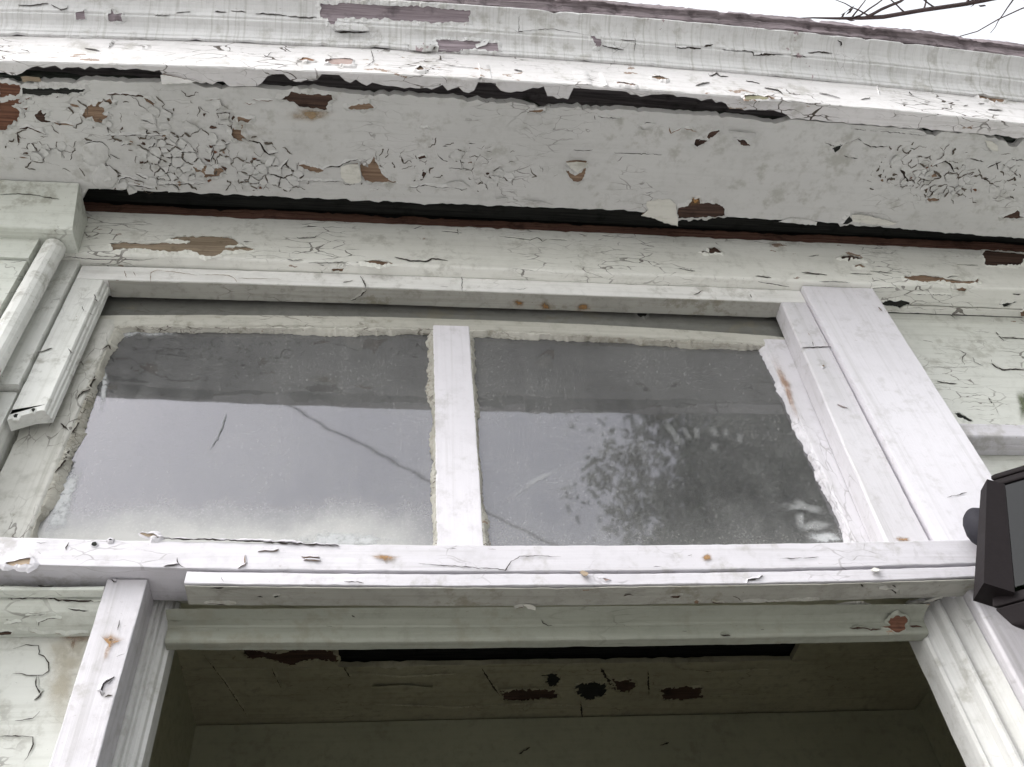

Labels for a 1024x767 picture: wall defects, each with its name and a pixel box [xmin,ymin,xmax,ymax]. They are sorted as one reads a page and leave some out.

peeling [315,0,503,55]
peeling [0,76,54,132]
peeling [275,86,377,114]
crack [0,91,556,199]
crack [825,137,1024,203]
peeling [641,196,729,226]
peeling [107,235,255,260]
peeling [979,249,1024,269]
crack [938,331,1024,384]
peeling [0,555,40,573]
crack [0,578,117,761]
peeling [238,650,341,667]